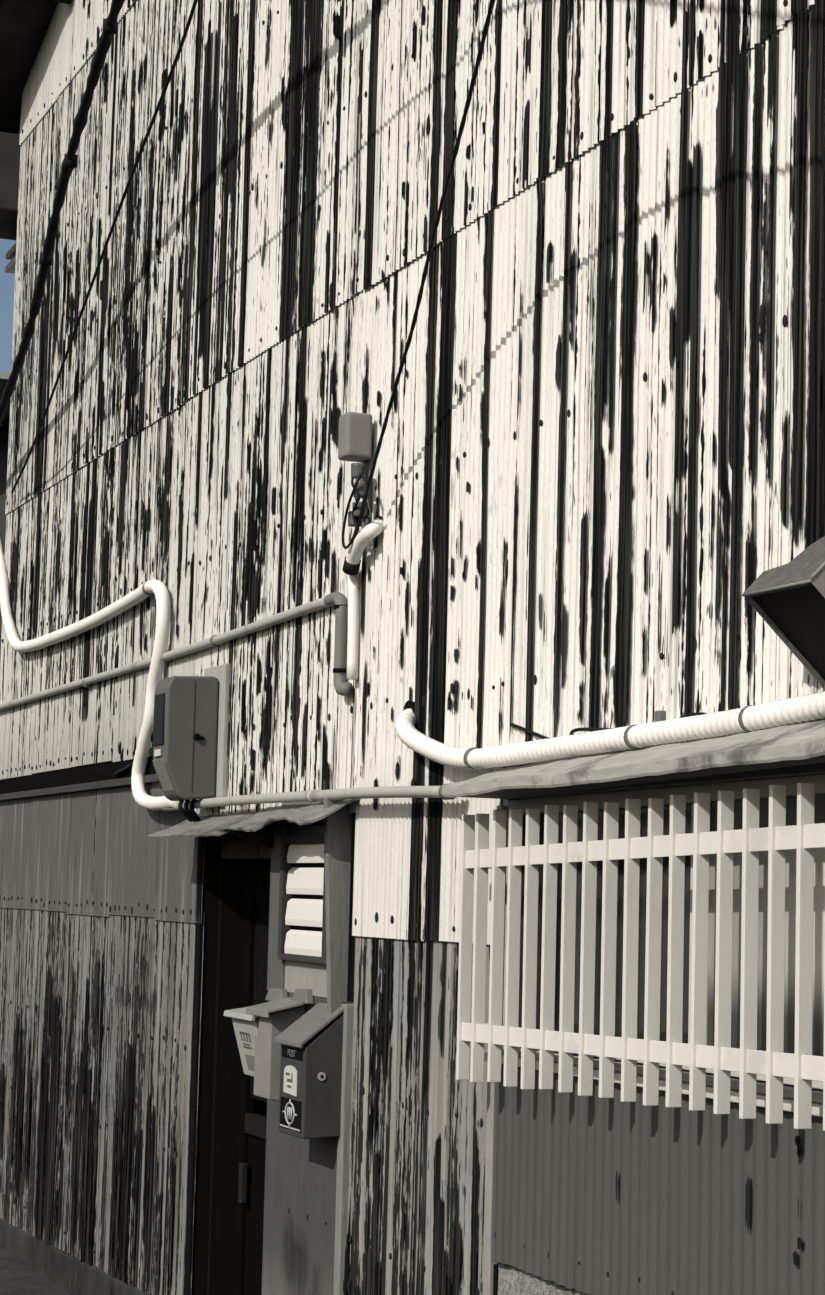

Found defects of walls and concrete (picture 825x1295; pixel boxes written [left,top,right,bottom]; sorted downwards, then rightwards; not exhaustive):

rust [9,26,127,722]
rust [159,0,256,789]
rust [273,0,381,778]
rust [414,0,461,744]
rust [475,0,747,749]
rust [763,0,825,570]
rust [0,942,104,1266]
rust [110,1041,176,1295]
rust [399,751,479,1295]